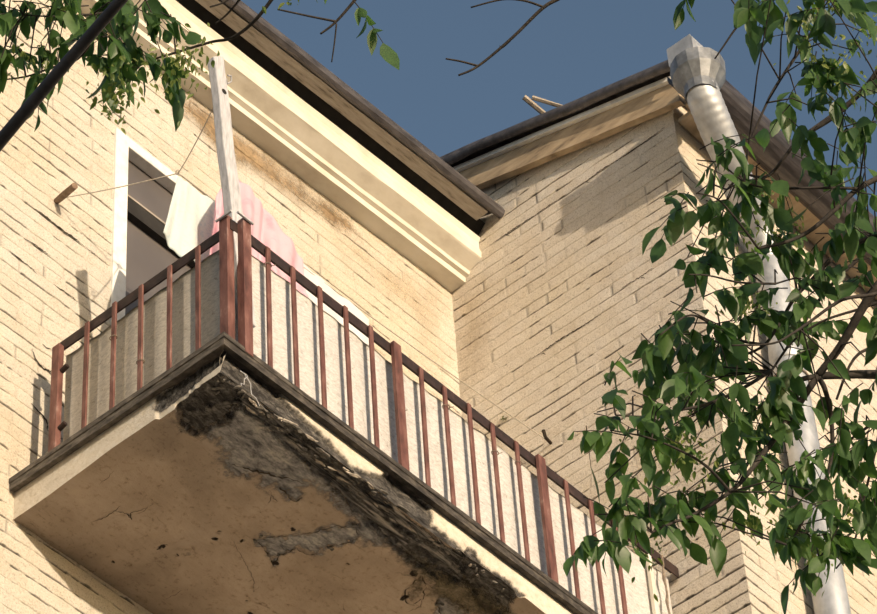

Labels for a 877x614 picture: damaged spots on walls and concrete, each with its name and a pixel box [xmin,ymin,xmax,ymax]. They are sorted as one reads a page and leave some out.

crack [91,506,147,523]
spalling [152,352,525,614]